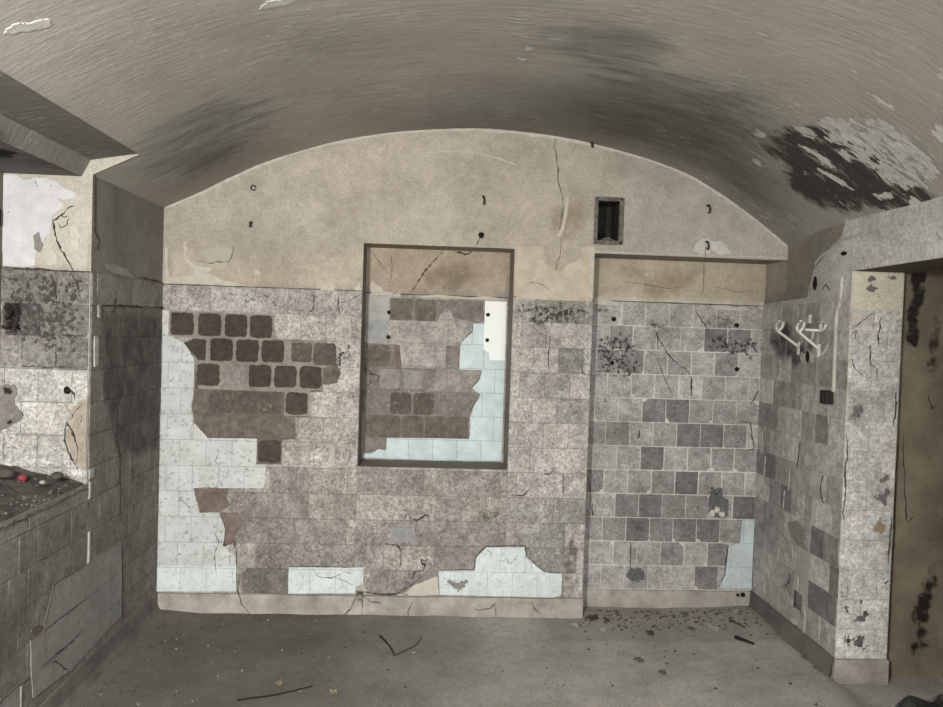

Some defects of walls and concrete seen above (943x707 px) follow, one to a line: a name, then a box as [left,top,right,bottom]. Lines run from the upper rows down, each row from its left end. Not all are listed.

peeling [930,122,943,143]
peeling [2,174,75,267]
crack [370,225,484,293]
spalling [164,128,787,461]
leakage [598,333,642,377]
leakage [906,272,938,366]
spalling [157,310,341,591]
peeling [288,545,562,598]